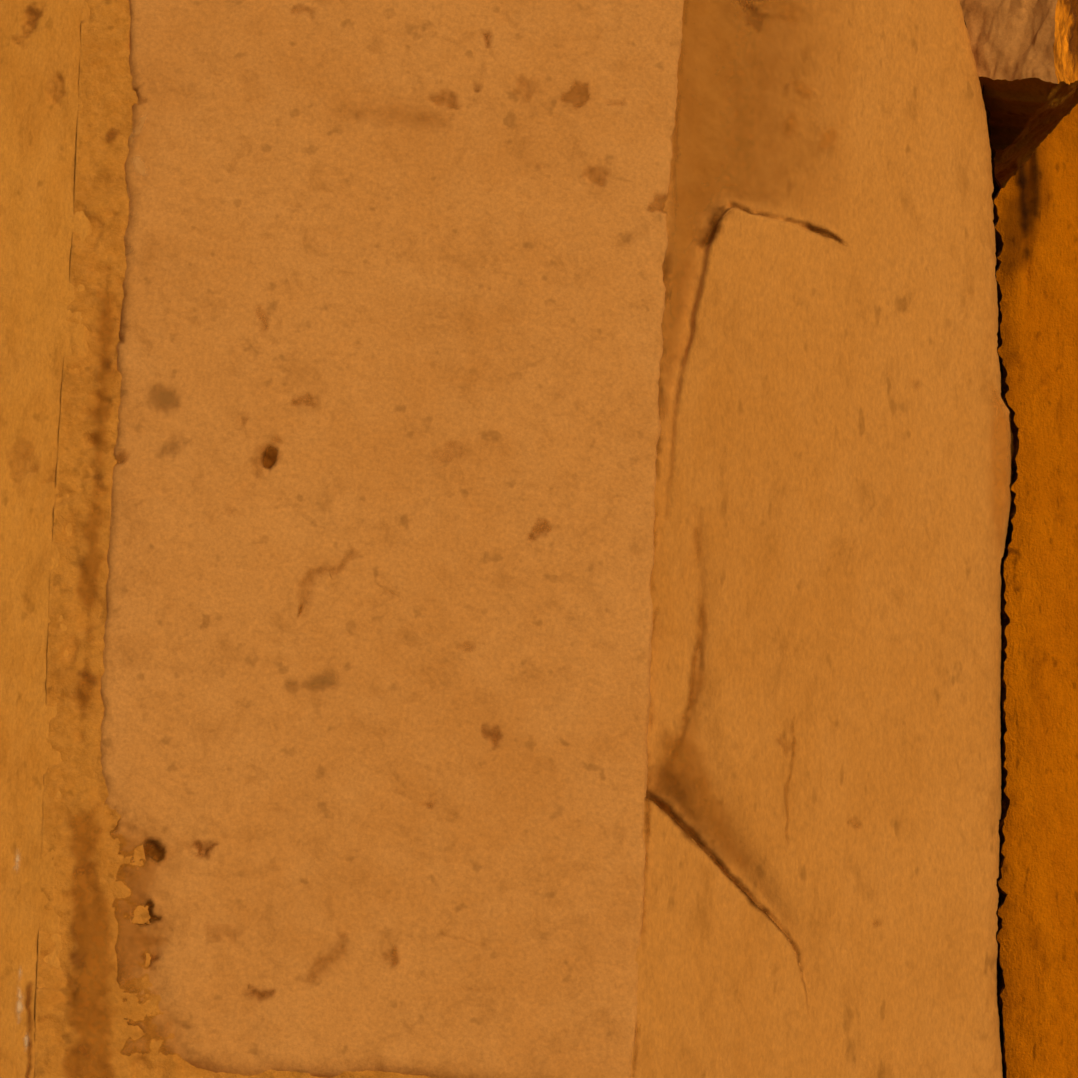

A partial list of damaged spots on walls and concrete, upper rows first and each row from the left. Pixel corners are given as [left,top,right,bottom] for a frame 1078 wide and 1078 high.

crack [646,795,793,943]